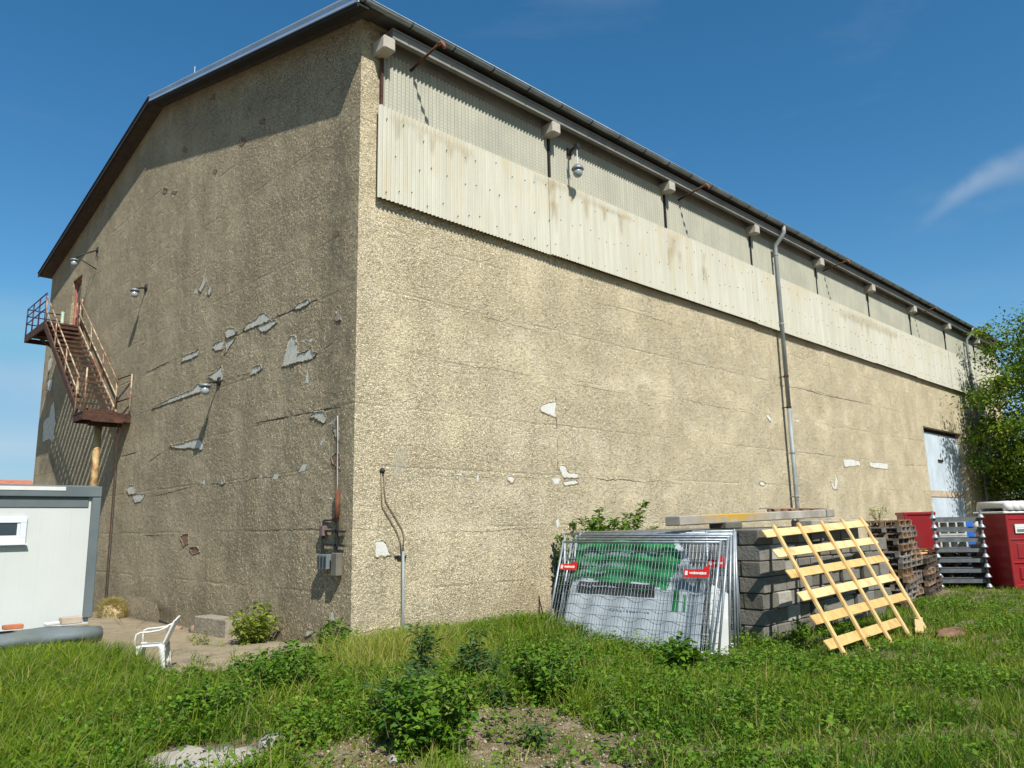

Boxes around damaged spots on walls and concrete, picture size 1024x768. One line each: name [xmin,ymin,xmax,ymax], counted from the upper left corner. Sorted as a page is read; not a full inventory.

flaking render [151,312,278,410]
flaking render [282,334,326,384]
crack [254,403,346,424]
flaking render [539,401,557,418]
flaking render [170,438,205,451]
flaking render [552,464,579,486]
flaking render [830,458,888,490]
flaking render [127,484,146,503]
flaking render [180,533,200,555]
flaking render [373,539,392,559]